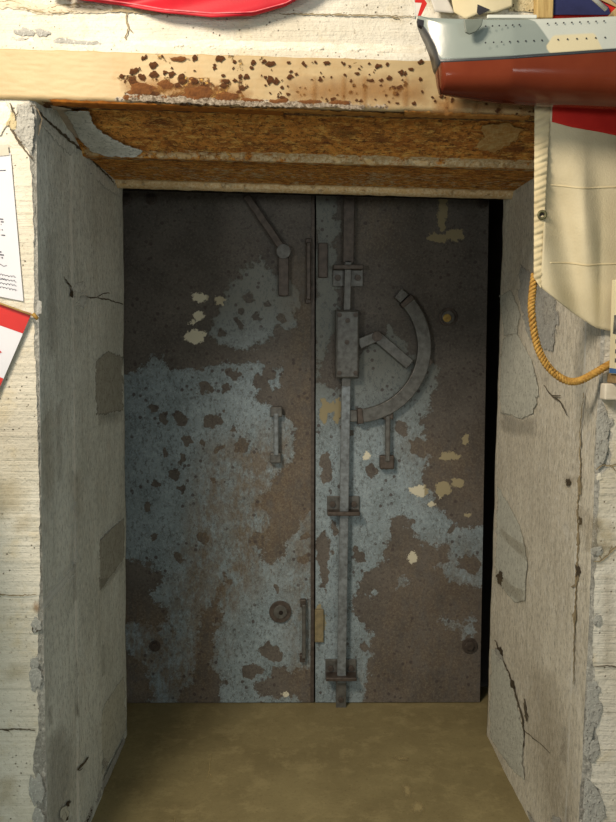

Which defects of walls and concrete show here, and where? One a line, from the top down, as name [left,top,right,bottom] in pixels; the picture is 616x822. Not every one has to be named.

corrosion [50,54,535,152]
crack [64,276,122,304]
spalling [29,100,47,822]
spalling [579,329,614,822]
spalling [489,647,524,779]
crack [494,640,550,753]